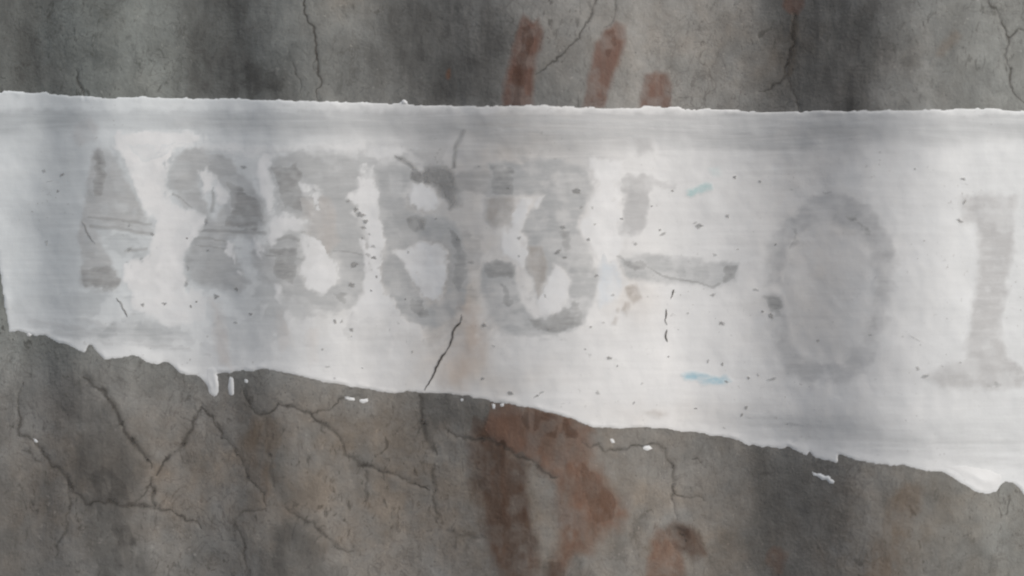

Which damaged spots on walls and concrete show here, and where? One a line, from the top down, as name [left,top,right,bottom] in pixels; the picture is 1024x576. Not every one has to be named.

crack [303,0,321,101]
corrosion [501,11,546,106]
corrosion [581,19,630,109]
corrosion [637,67,675,108]
crack [425,314,462,389]
corrosion [461,401,633,576]
corrosion [643,521,689,576]